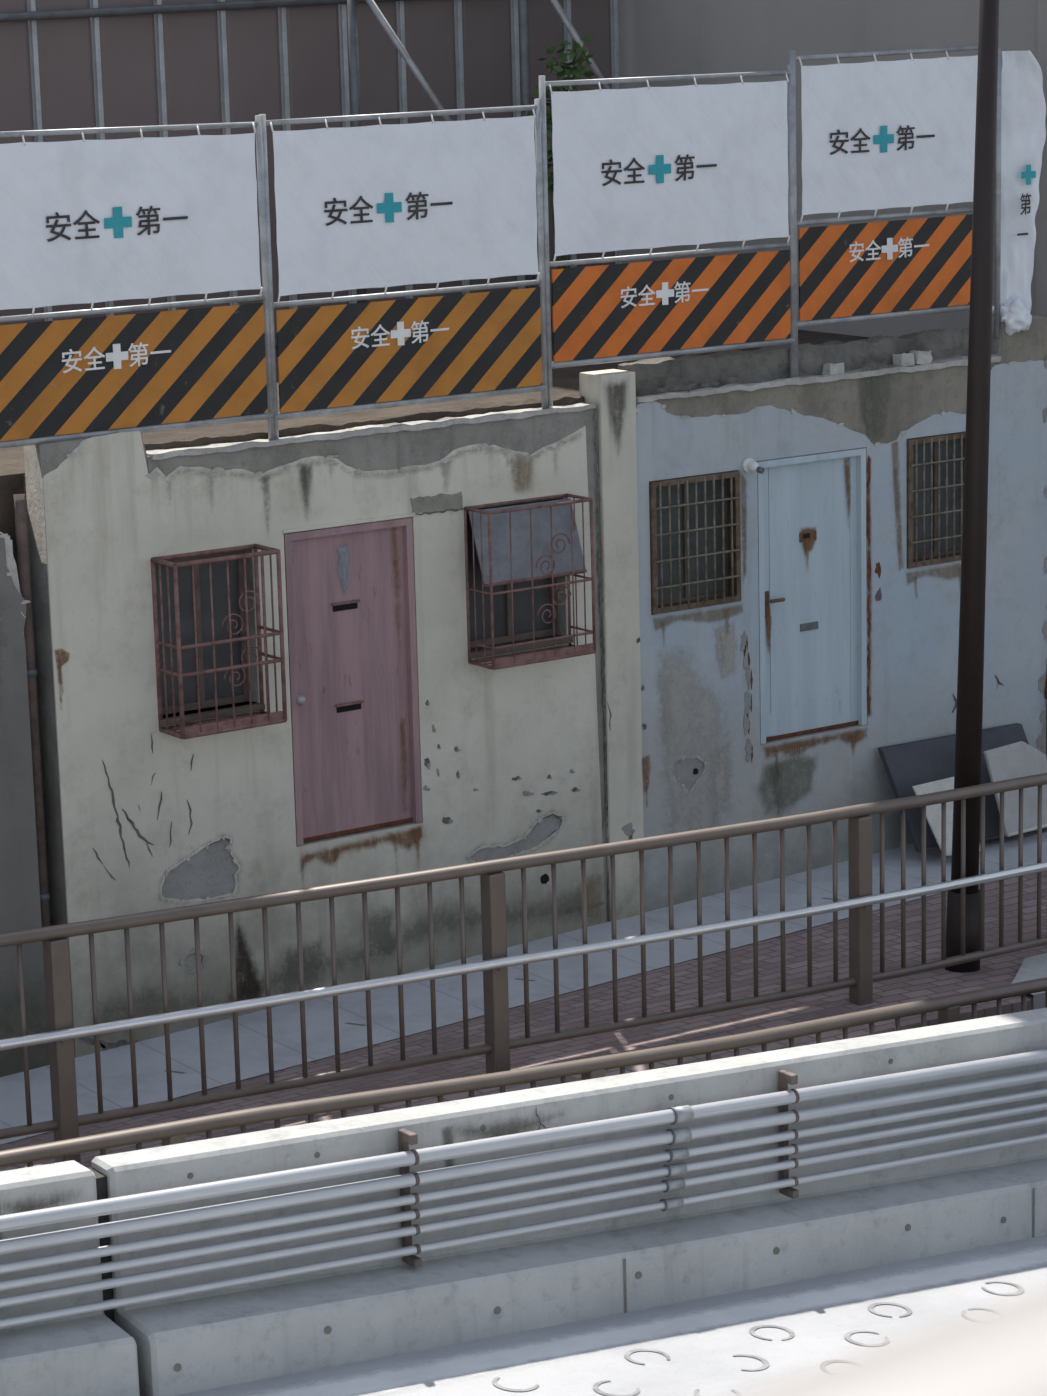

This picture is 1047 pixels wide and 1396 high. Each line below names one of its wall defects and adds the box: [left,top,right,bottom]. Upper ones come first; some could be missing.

flaking render [991,318,1047,369]
flaking render [636,366,968,446]
flaking render [40,441,81,478]
flaking render [146,408,597,479]
corrosion [765,455,871,760]
corrosion [55,650,69,700]
flaking render [670,757,707,791]
crack [93,734,194,880]
flaking render [160,837,238,902]
corrosion [303,827,422,864]
flaking render [467,769,580,862]